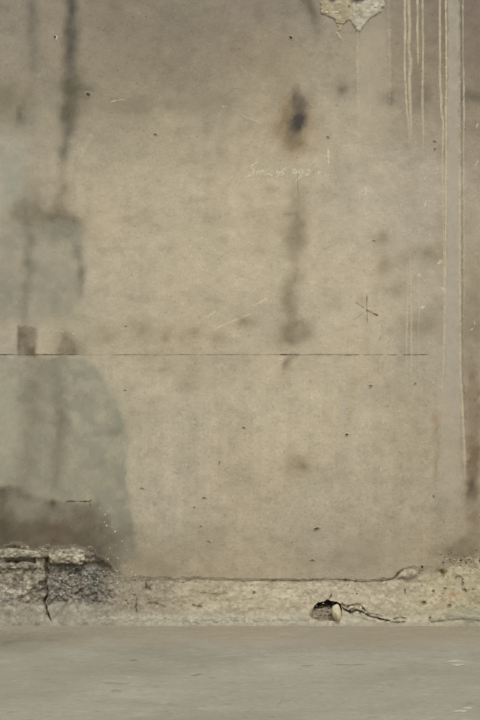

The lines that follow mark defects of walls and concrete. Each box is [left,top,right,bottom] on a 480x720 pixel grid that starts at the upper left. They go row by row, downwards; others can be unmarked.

leakage [65,0,75,60]
flaking render [320,0,385,40]
leakage [404,0,423,41]
leakage [439,0,465,181]
leakage [282,108,305,147]
leakage [0,328,136,566]
spalling [0,541,480,626]
crack [342,604,406,623]